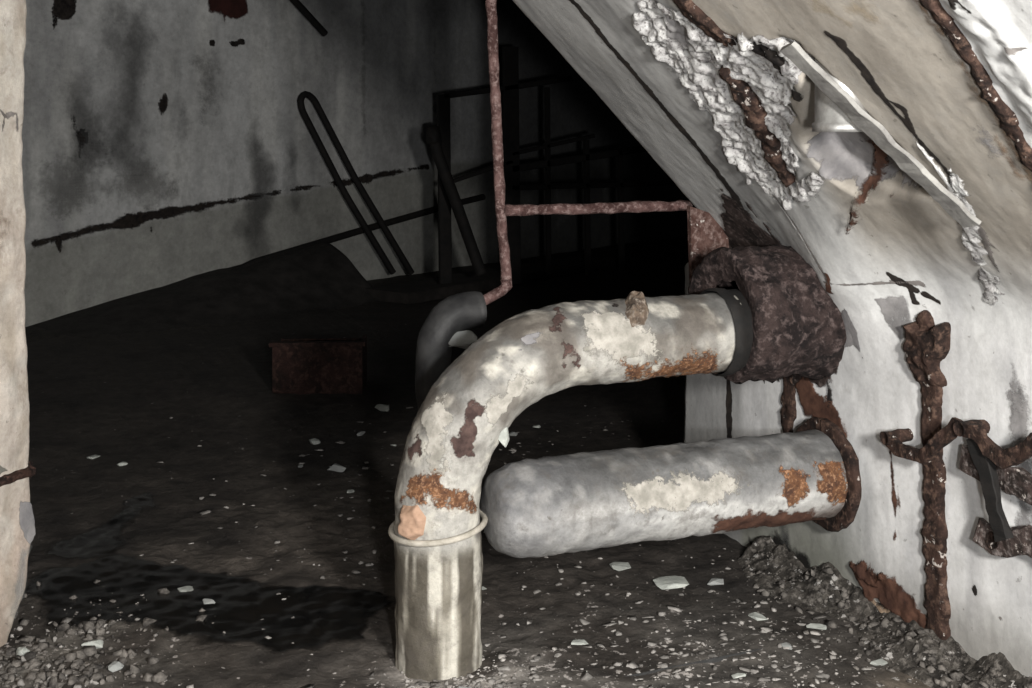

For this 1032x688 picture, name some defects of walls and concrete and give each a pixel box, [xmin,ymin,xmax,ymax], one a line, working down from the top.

leakage [246,143,271,239]
rust [0,461,37,487]
rust [889,451,900,517]
rust [849,560,927,628]